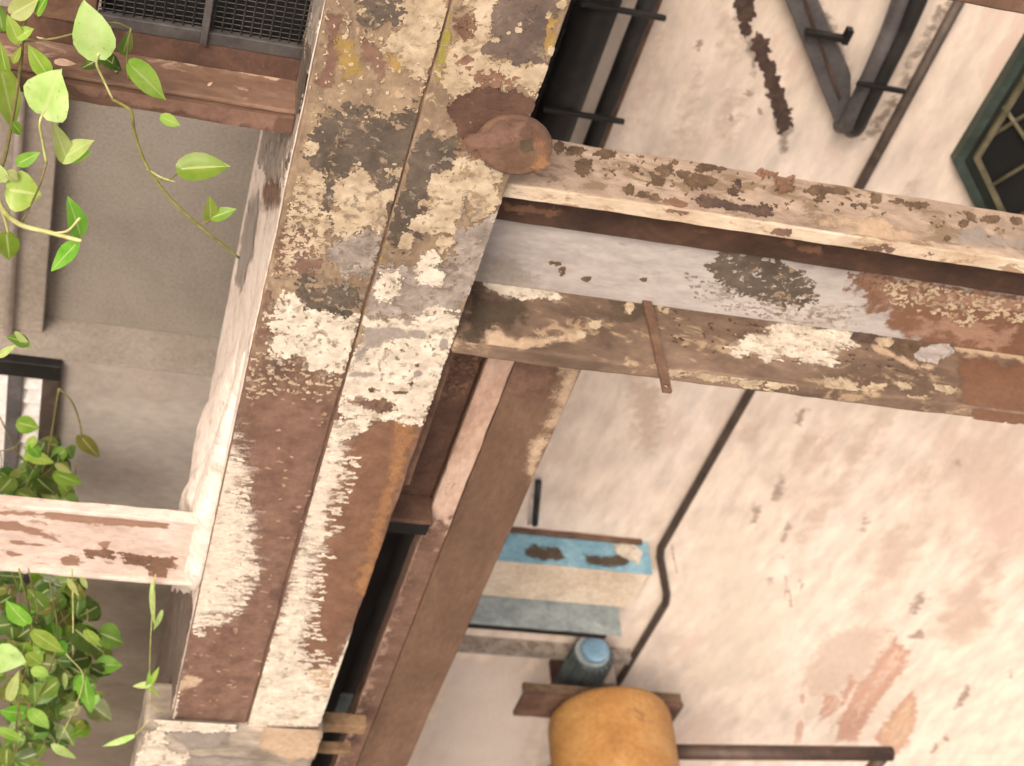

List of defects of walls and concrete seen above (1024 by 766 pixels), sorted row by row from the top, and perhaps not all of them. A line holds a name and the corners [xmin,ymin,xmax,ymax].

rust [440,12,551,175]
spalling [733,0,793,135]
peeling [136,0,568,766]
peeling [572,318,605,342]
peeling [553,140,1023,241]
peeling [668,251,960,401]
peeling [862,242,895,253]
rust [835,272,1024,425]
peeling [847,271,1024,328]
rust [176,378,421,719]
peeling [612,543,643,564]
rust [336,509,453,766]